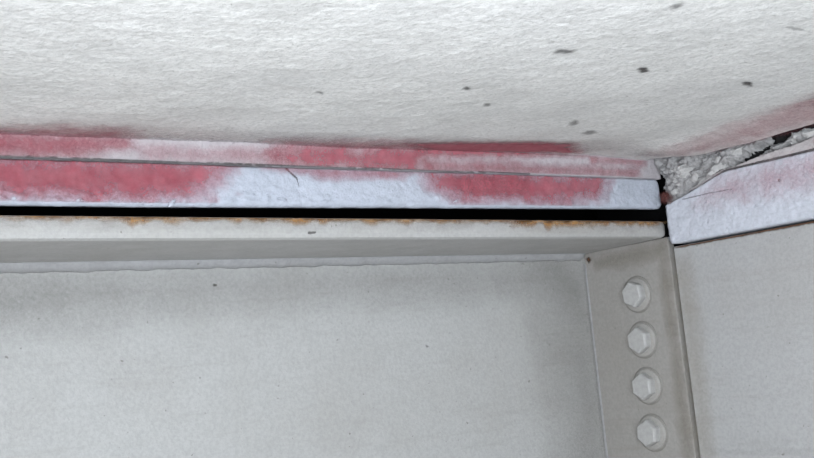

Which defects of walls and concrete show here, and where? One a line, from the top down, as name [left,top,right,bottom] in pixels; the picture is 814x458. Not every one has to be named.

spalling [653,137,775,204]